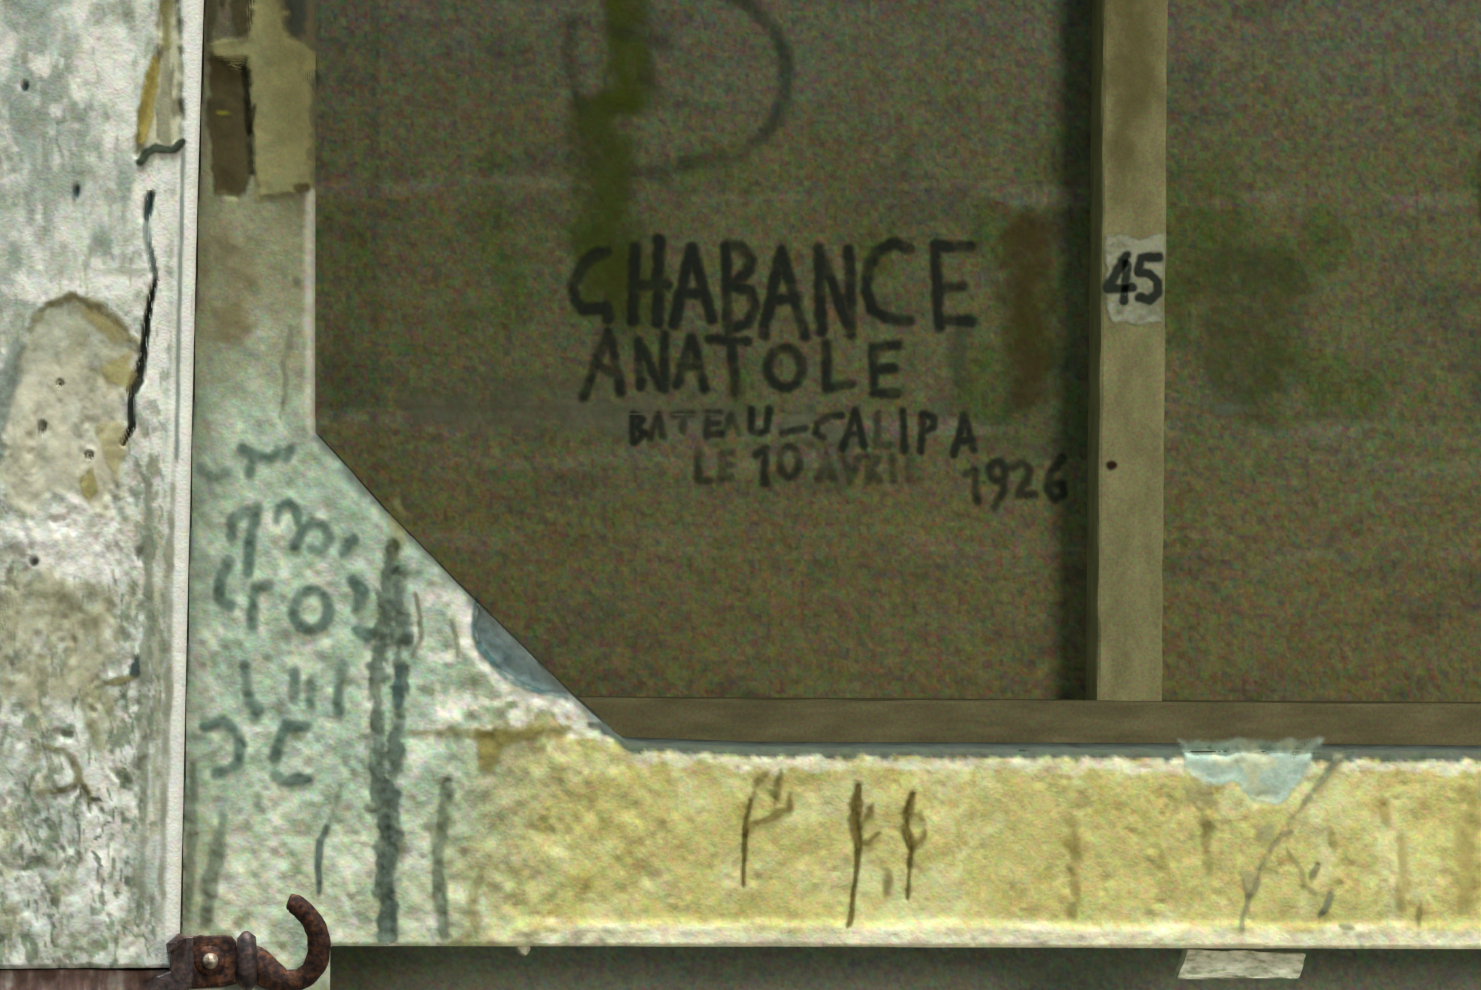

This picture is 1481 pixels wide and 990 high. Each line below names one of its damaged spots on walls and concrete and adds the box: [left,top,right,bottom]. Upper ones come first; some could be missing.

flaking render [207,0,254,197]
peeling [0,292,136,515]
crack [106,153,185,459]
spalling [1182,738,1322,807]
crack [1240,754,1354,929]